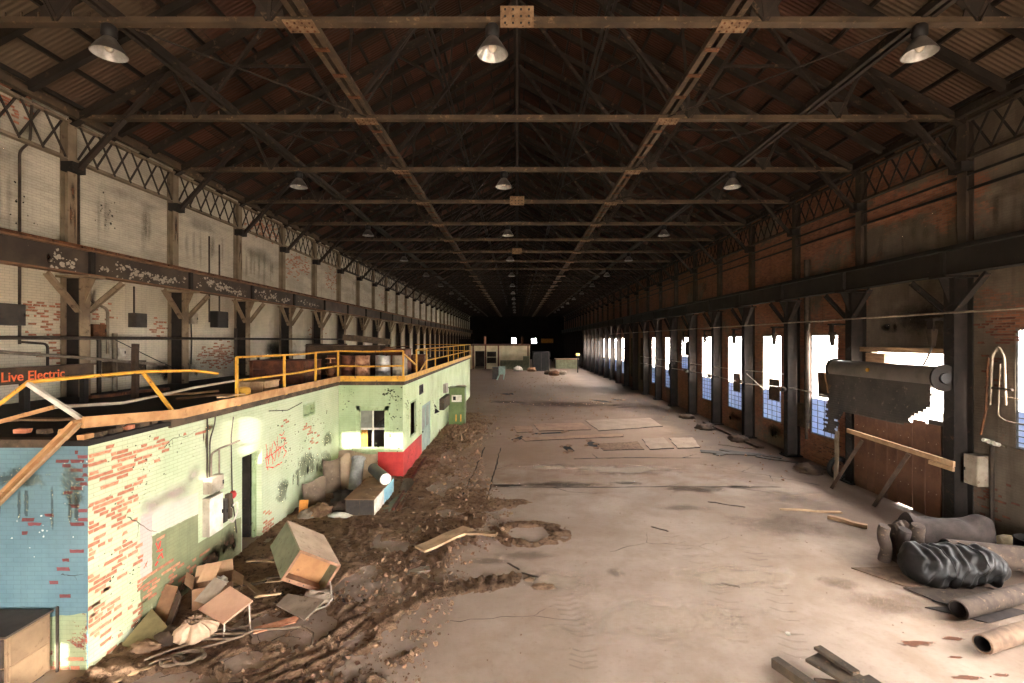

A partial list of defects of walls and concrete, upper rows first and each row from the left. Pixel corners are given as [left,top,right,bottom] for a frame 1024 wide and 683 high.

peeling [49,248,78,272]
peeling [99,261,242,297]
peeling [23,301,60,364]
peeling [196,340,234,369]
peeling [49,430,210,655]